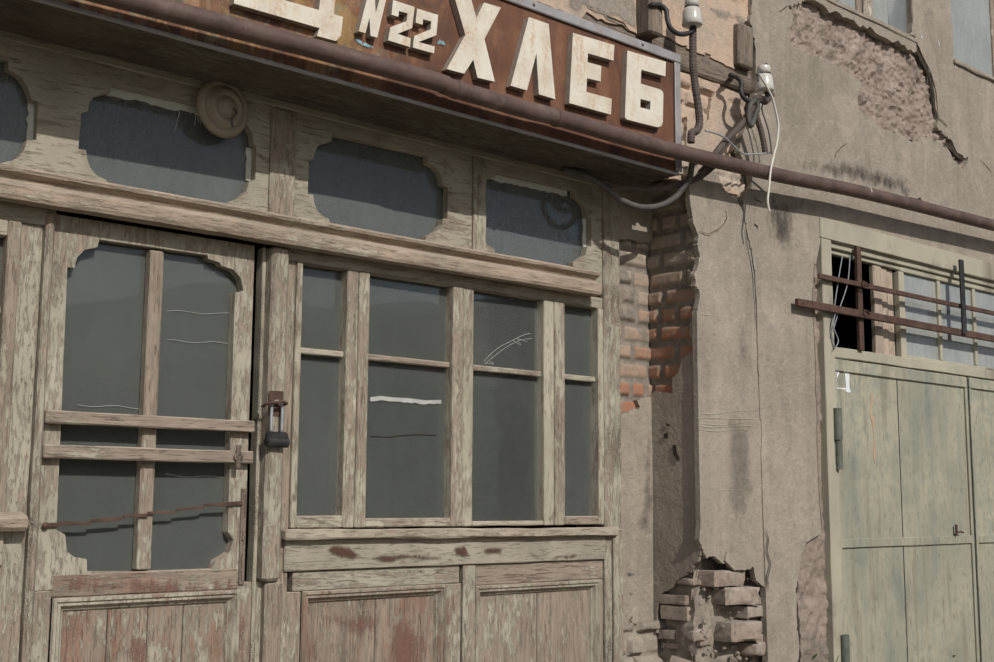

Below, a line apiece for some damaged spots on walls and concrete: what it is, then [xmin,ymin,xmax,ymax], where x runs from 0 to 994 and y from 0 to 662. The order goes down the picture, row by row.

flaking render [789,0,966,167]